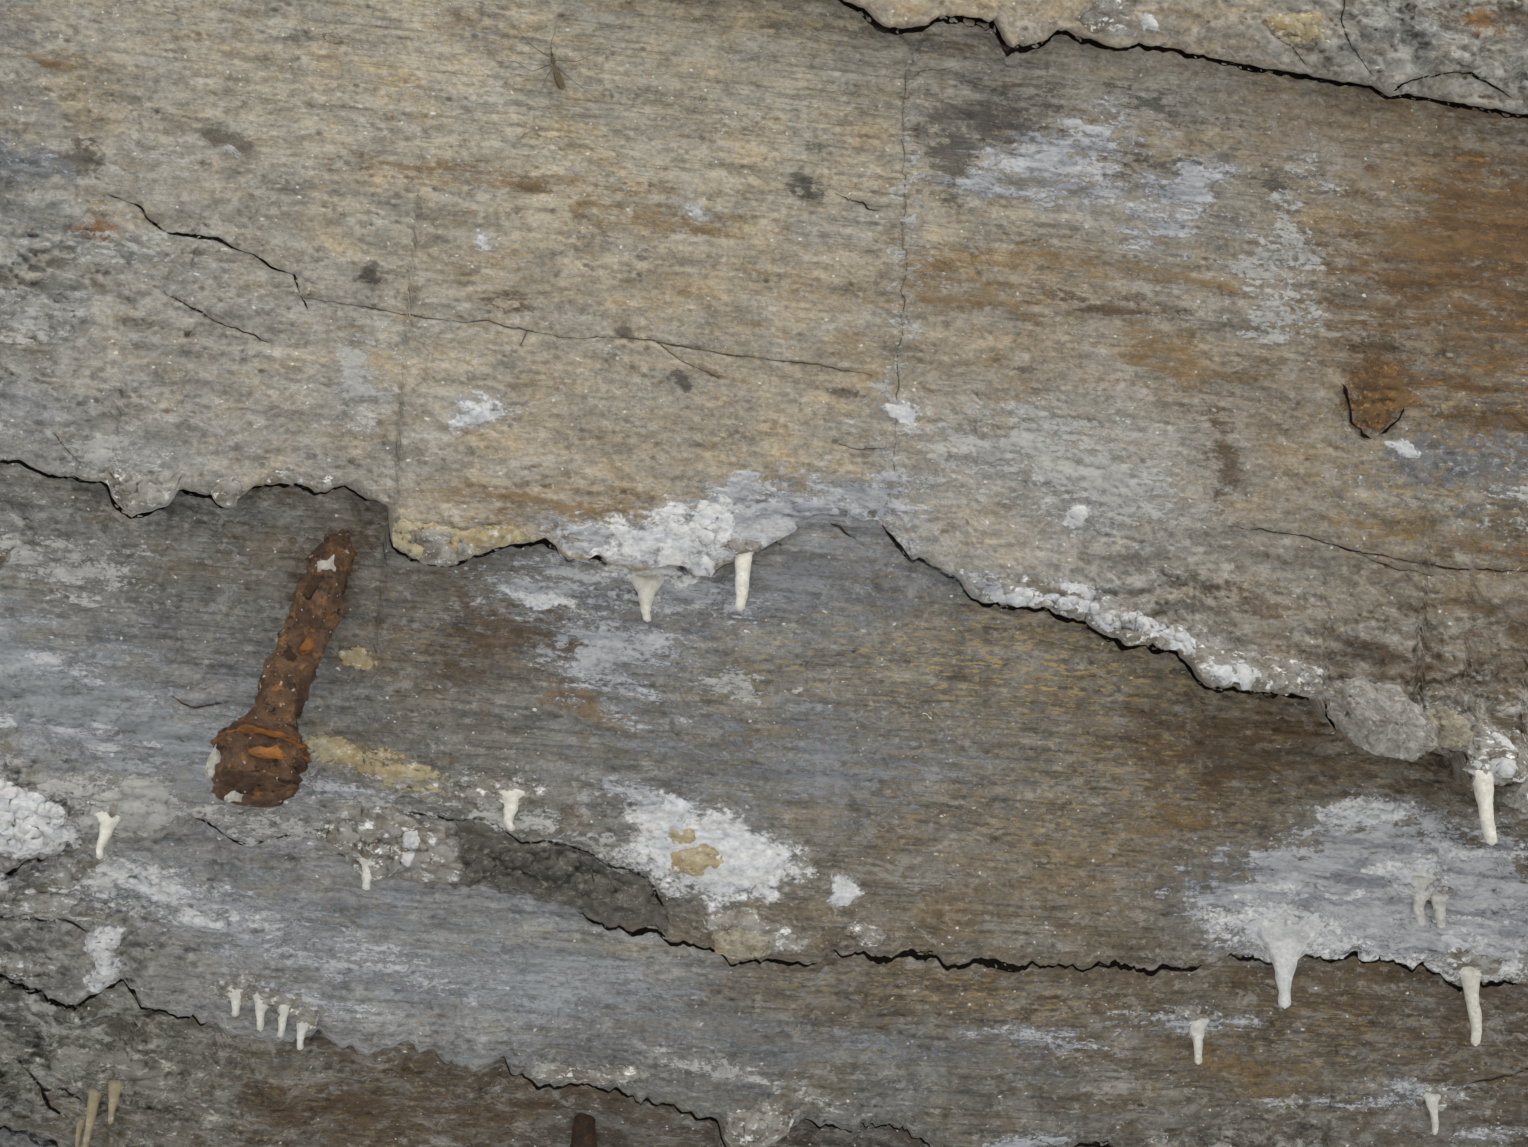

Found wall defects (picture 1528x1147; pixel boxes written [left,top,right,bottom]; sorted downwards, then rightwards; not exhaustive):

leakage [0,206,181,360]
crack [108,0,1528,486]
crack [0,432,632,573]
rust [281,633,317,662]
rust [286,561,325,601]
crack [830,523,1353,729]
rust [234,774,262,794]
rust [210,724,313,775]
leakage [1420,699,1528,801]
crack [374,804,1517,992]
leakage [1154,779,1528,983]
leakage [1310,1078,1527,1140]